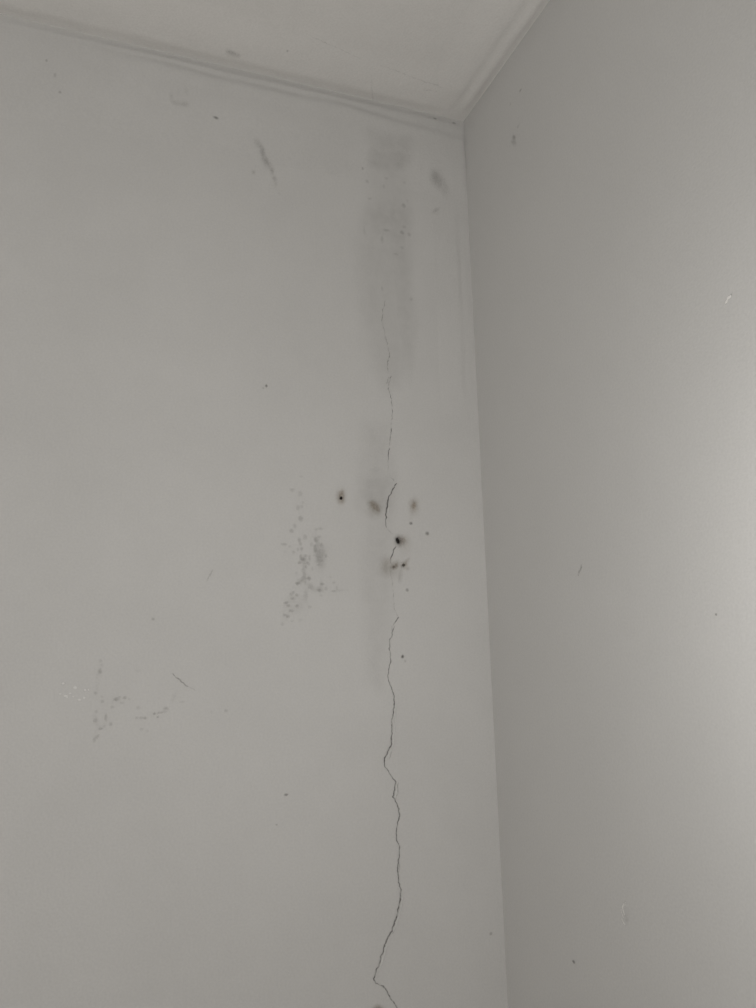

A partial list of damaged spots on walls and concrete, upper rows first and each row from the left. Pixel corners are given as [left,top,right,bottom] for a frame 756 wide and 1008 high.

crack [373,620,404,997]